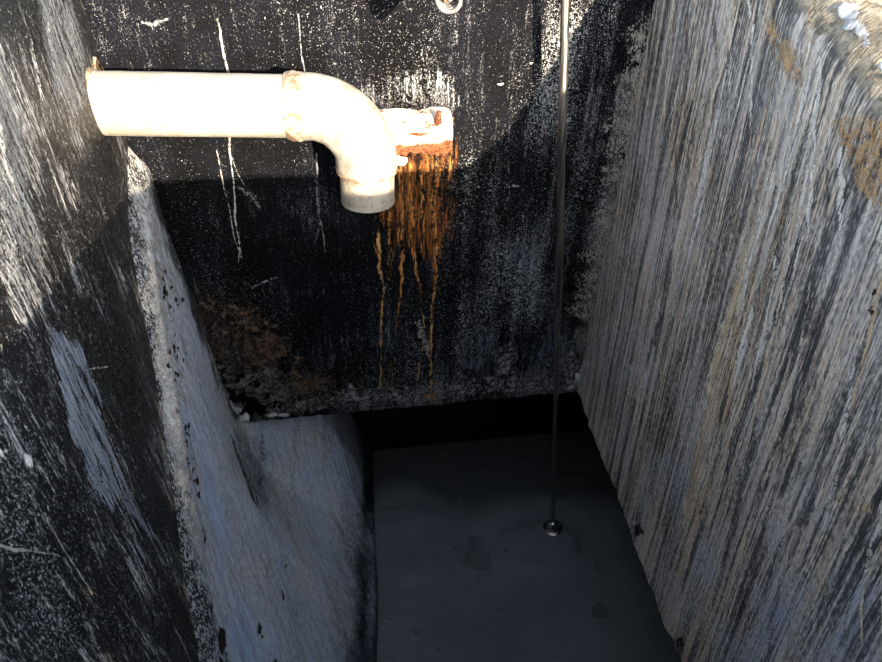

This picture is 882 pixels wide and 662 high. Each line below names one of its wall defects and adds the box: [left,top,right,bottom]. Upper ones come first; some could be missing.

peeling [833,1,871,48]
corrosion [832,111,882,212]
corrosion [374,144,457,400]
water stain [192,273,561,412]